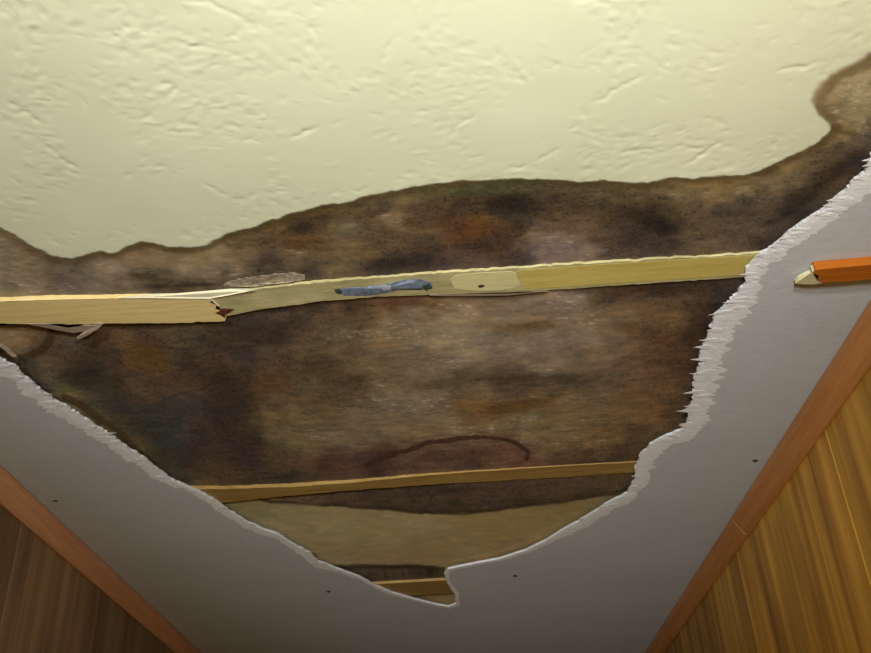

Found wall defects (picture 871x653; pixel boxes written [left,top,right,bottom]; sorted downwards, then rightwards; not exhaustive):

water stain [0,53,871,299]
water stain [0,277,745,582]
peeling [679,405,702,428]
peeling [691,328,727,361]